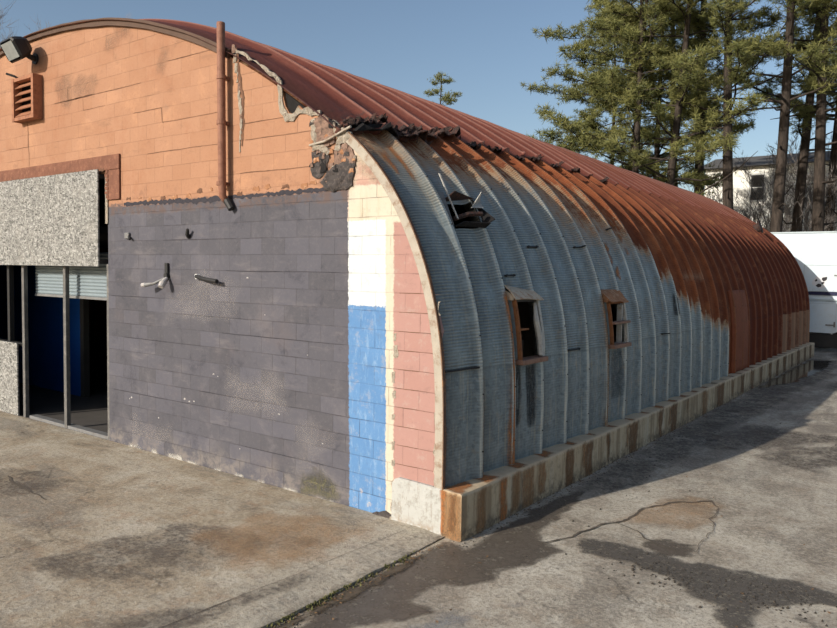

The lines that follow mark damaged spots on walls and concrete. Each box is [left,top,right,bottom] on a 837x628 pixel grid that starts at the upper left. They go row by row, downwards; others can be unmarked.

crack [55,83,139,111]
spalling [124,44,544,206]
rust [441,295,551,541]
rust [565,433,593,486]
rust [625,346,811,453]